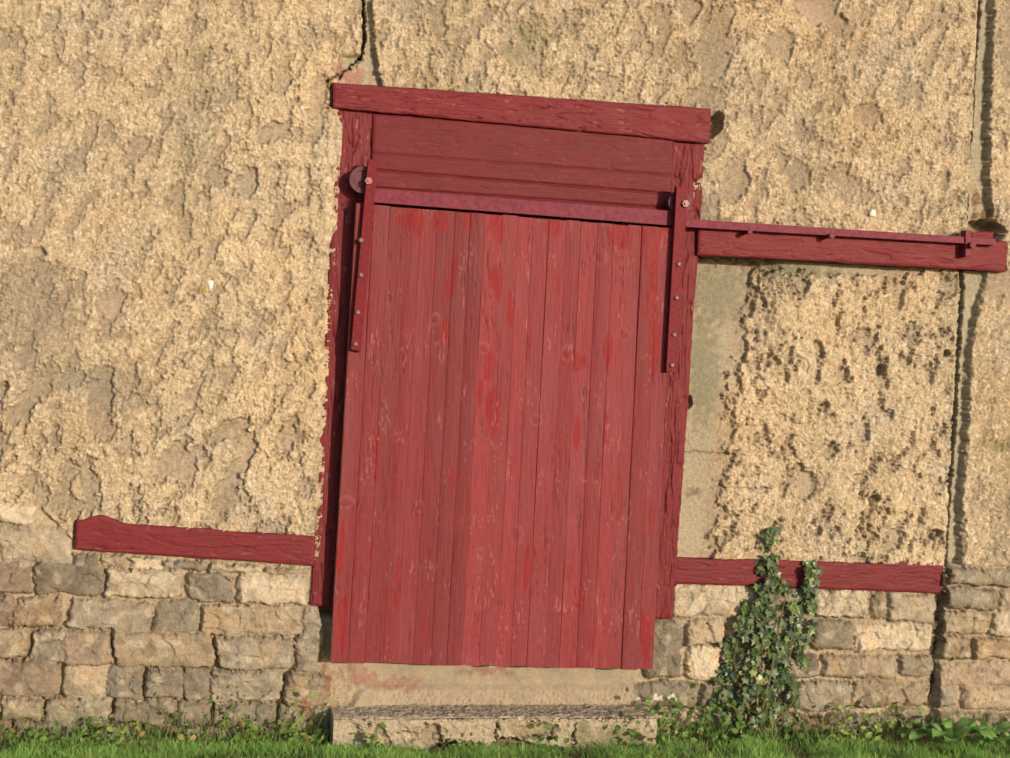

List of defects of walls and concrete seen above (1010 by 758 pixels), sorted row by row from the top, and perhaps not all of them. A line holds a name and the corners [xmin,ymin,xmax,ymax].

crack [324,0,367,84]